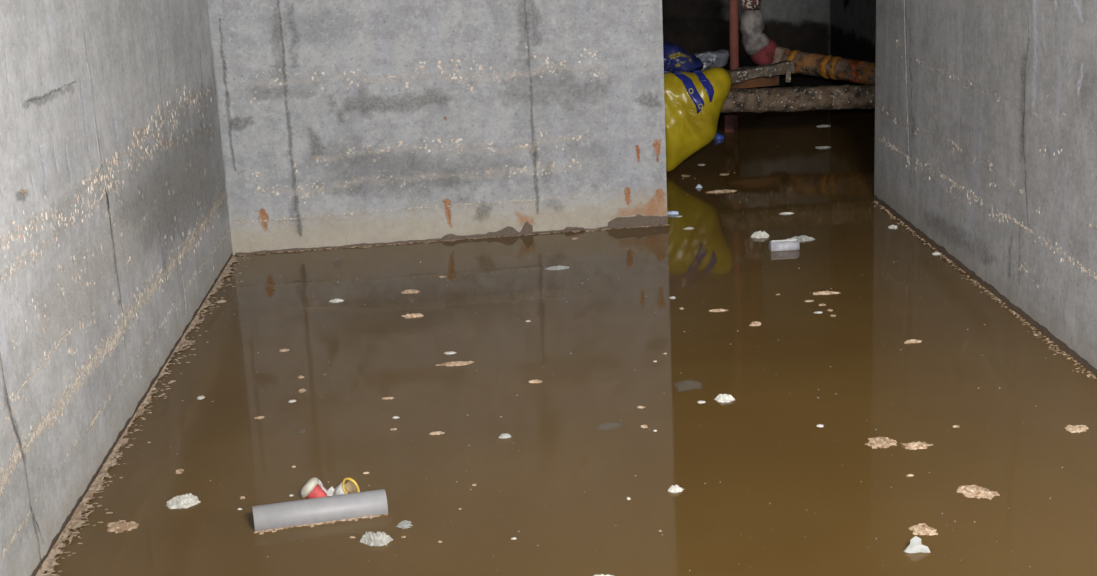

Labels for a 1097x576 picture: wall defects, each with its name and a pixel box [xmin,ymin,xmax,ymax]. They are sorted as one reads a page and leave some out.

crack [278,0,302,235]
rust [622,188,665,215]
leakage [874,195,1097,376]
leakage [879,137,1097,280]